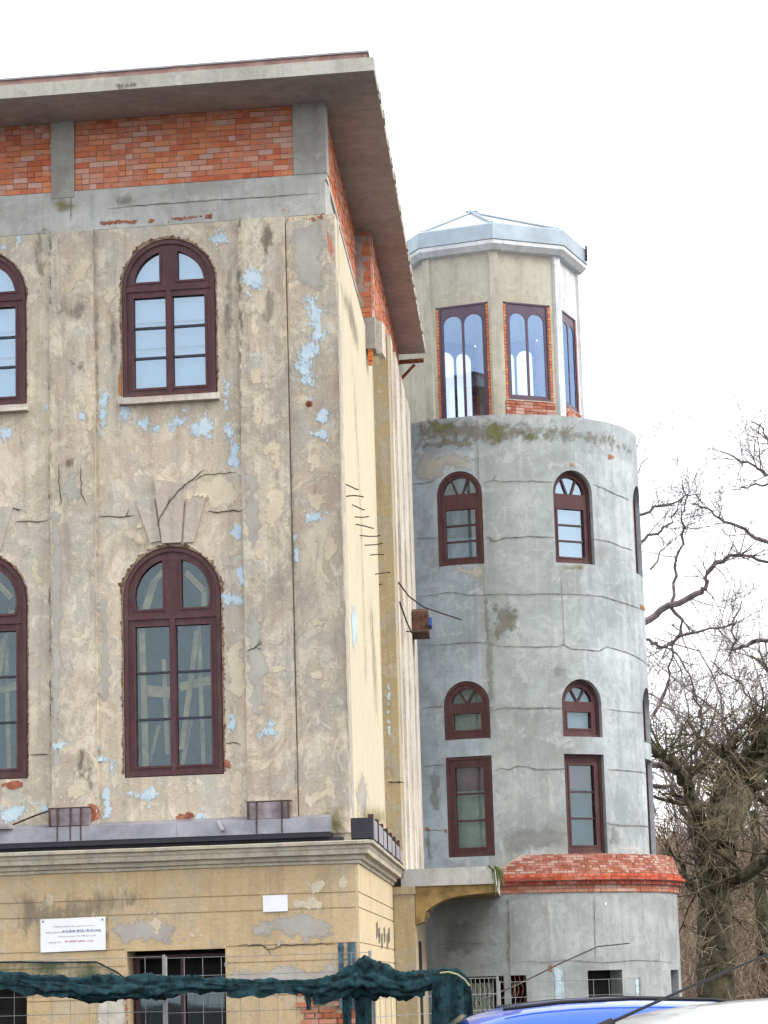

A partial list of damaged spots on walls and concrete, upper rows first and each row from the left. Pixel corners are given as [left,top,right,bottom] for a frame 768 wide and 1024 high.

water stain [414,420,629,451]
flaking render [60,214,328,823]
crack [157,470,236,526]
peeling [293,281,384,813]
crack [484,535,554,543]
crack [416,568,647,664]
flaking render [0,502,68,790]
crack [494,763,565,771]
flaking render [112,909,203,945]
crack [238,943,329,954]
flaking render [252,868,351,946]